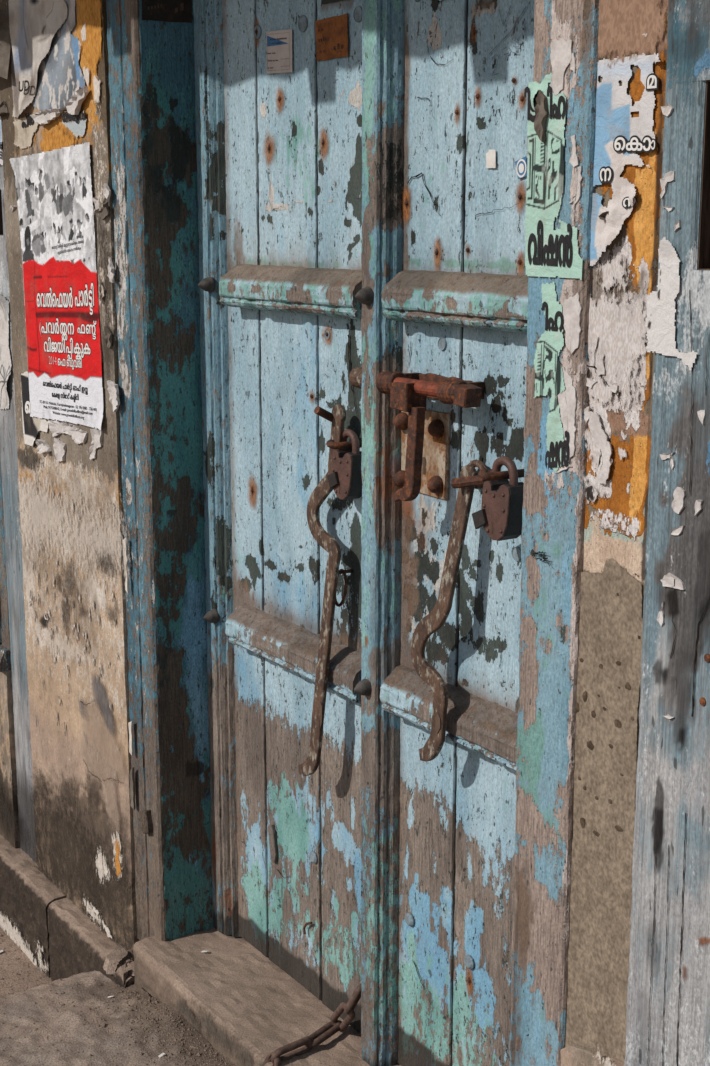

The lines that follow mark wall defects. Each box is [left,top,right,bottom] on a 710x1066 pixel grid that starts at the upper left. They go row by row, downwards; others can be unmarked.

peeling [597,0,665,67]
peeling [586,253,649,413]
peeling [585,429,627,471]
peeling [583,474,606,504]
leakage [667,589,677,615]
leakage [79,676,114,734]
leakage [654,810,662,852]
leakage [31,774,136,950]